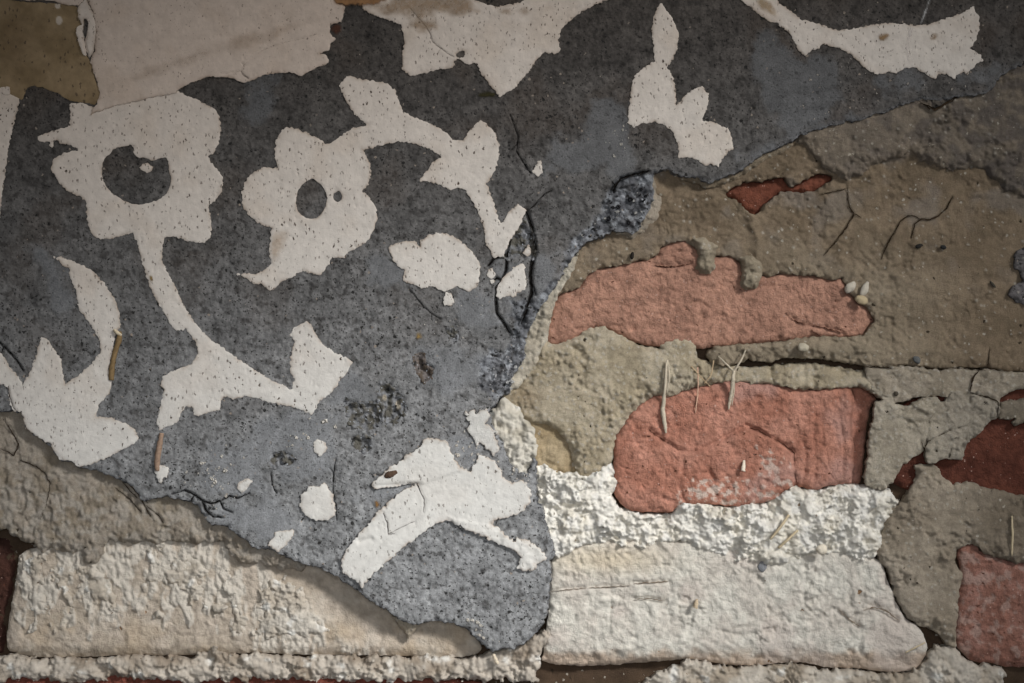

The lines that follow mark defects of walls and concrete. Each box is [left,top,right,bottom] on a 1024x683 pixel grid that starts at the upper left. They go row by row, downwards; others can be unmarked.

peeling [0,0,100,105]
crack [488,119,552,335]
crack [820,188,860,256]
crack [881,197,953,259]
flaking render [548,241,873,349]
crack [117,485,249,522]
peeling [299,482,336,521]
flaking render [613,381,876,513]
flaking render [894,418,1024,495]
flaking render [0,538,485,658]
flaking render [541,540,927,672]
flaking render [6,675,183,683]